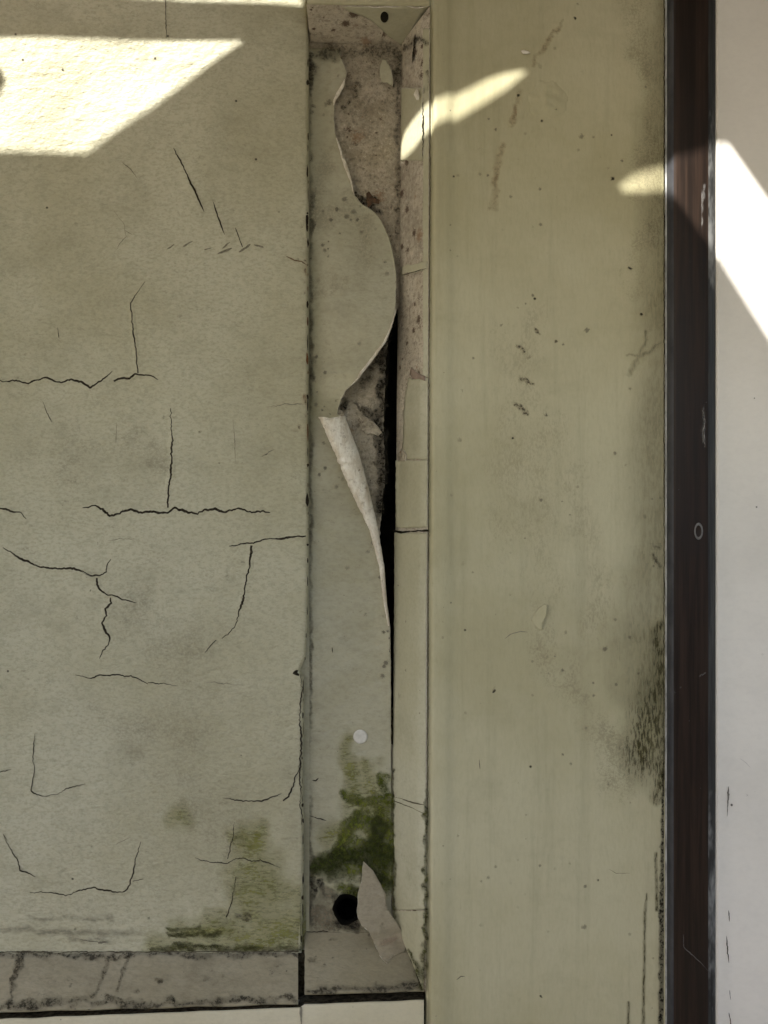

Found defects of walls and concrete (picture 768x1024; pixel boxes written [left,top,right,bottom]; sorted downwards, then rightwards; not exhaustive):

crack [174,149,243,247]
crack [0,280,159,422]
crack [0,408,306,689]
peeling [293,6,430,987]
crack [0,736,83,797]
crack [3,834,144,899]
crack [197,677,326,917]
damp [309,845,359,923]
damp [625,621,664,1024]